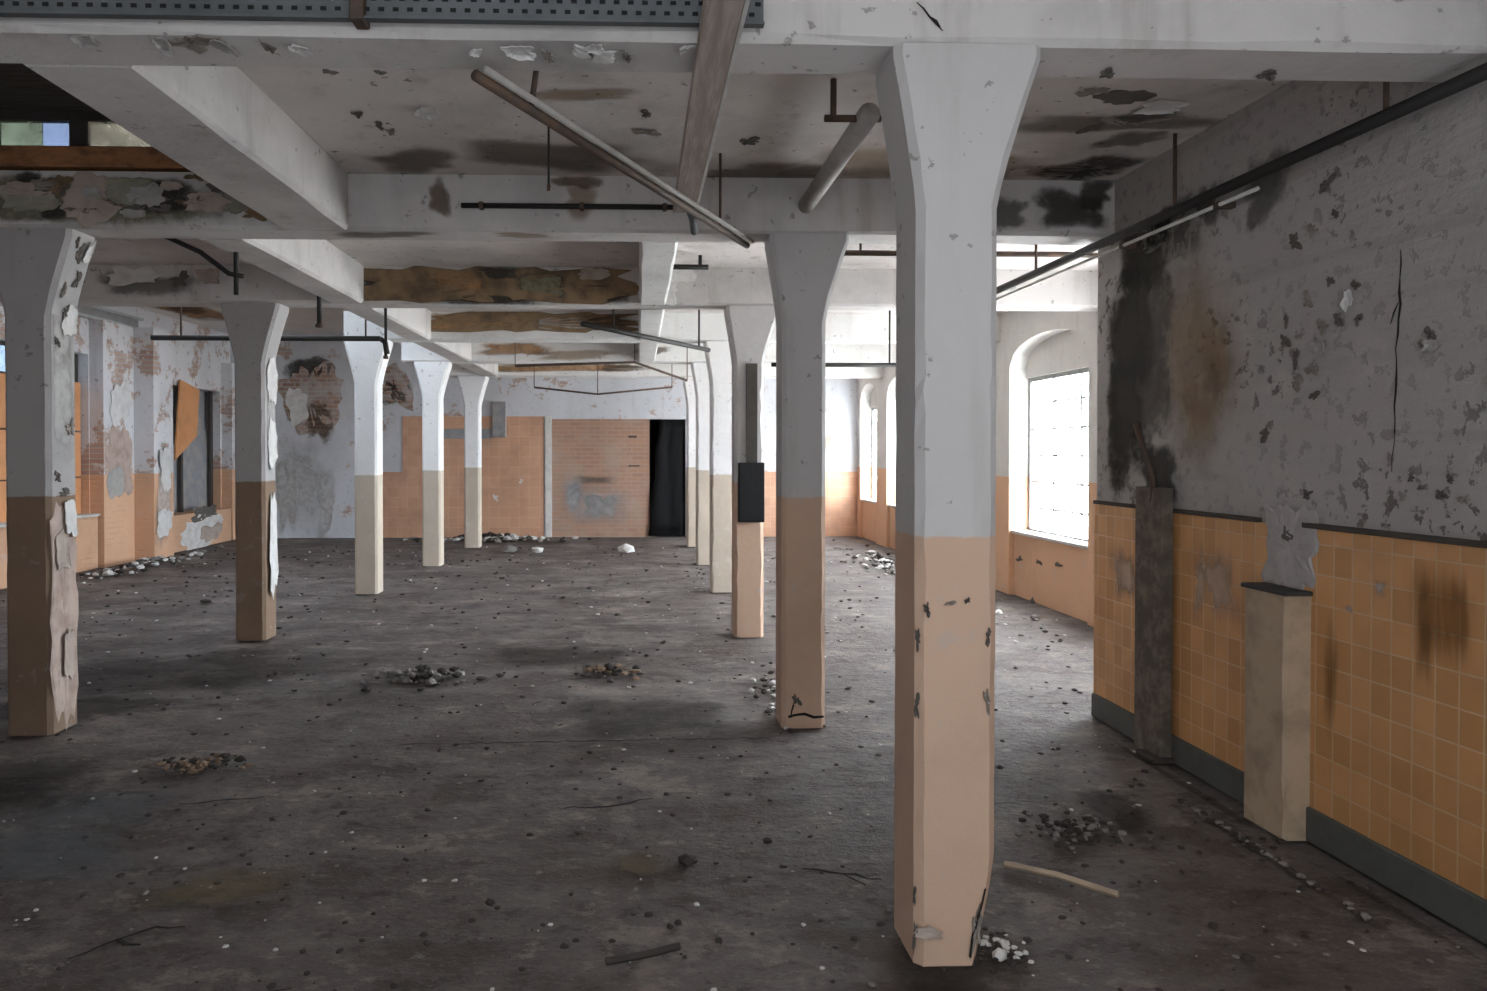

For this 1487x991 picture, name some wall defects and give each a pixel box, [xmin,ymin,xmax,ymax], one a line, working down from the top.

water stain [716,164,821,178]
water stain [997,110,1211,227]
water stain [1248,154,1282,227]
spalling [1289,223,1319,250]
spalling [1319,170,1338,195]
peeling [0,171,267,436]
water stain [1108,191,1216,499]
peeling [1280,277,1363,400]
flaking render [267,356,344,470]
spalling [1259,420,1273,443]
spalling [1398,471,1471,505]
peeling [269,493,279,600]